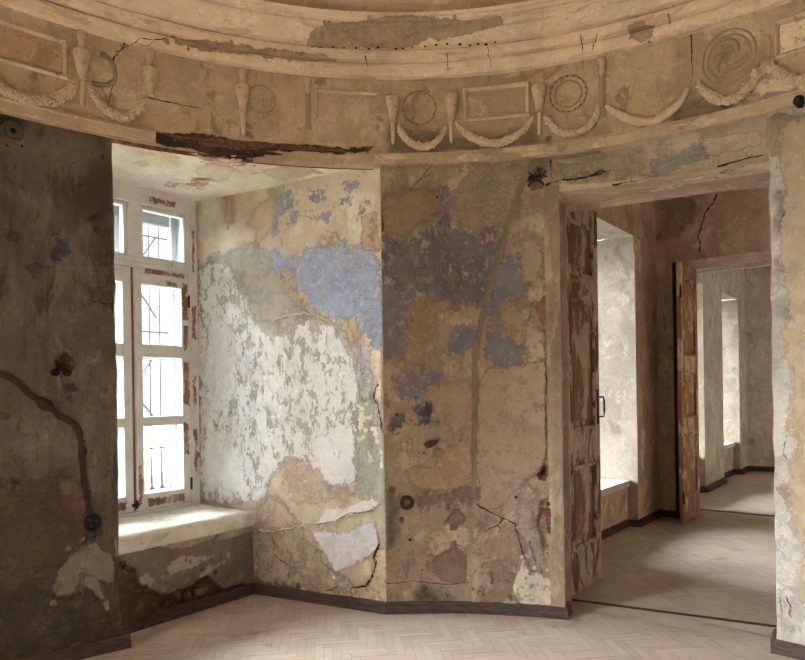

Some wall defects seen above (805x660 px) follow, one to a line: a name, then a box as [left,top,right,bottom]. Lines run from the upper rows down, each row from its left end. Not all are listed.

spalling [163,15,503,62]
crack [92,31,168,103]
spalling [191,153,256,169]
crack [545,160,642,186]
crack [717,155,764,168]
crack [698,193,717,262]
peeling [50,227,551,622]
peeling [776,481,794,524]
crack [476,503,538,570]
crack [326,543,470,594]